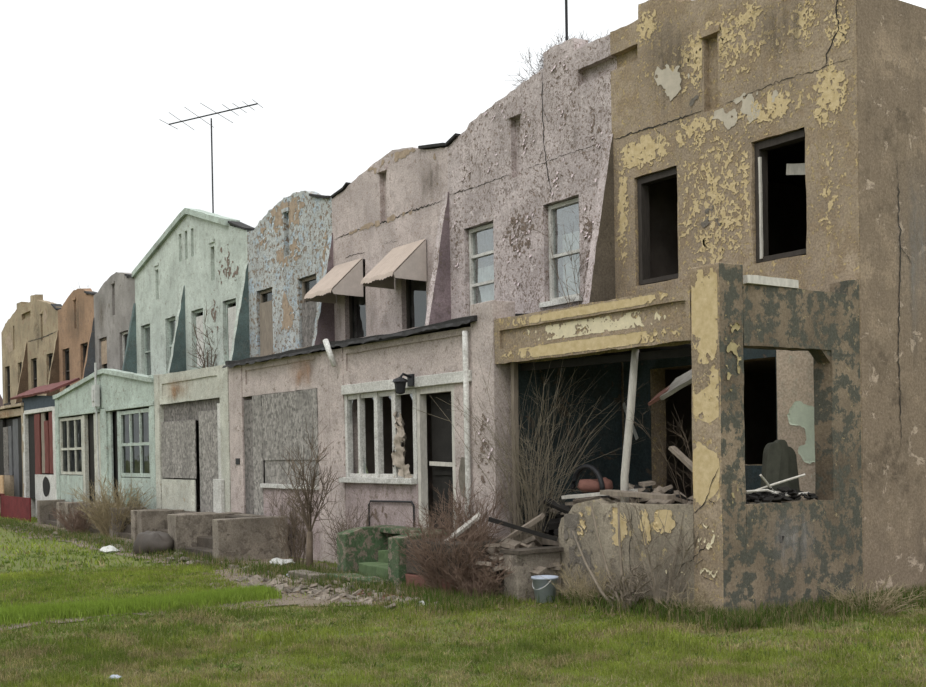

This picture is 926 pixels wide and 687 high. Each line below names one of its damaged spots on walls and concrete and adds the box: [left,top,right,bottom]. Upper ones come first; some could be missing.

crack [723,0,847,105]
crack [614,111,701,143]
crack [338,76,593,258]
peeling [257,197,307,270]
spalling [580,205,594,263]
peeling [614,0,852,423]
peeling [504,293,679,358]
peeling [787,401,815,464]
peeling [693,439,720,507]
spalling [564,512,595,589]
peeling [609,507,675,547]